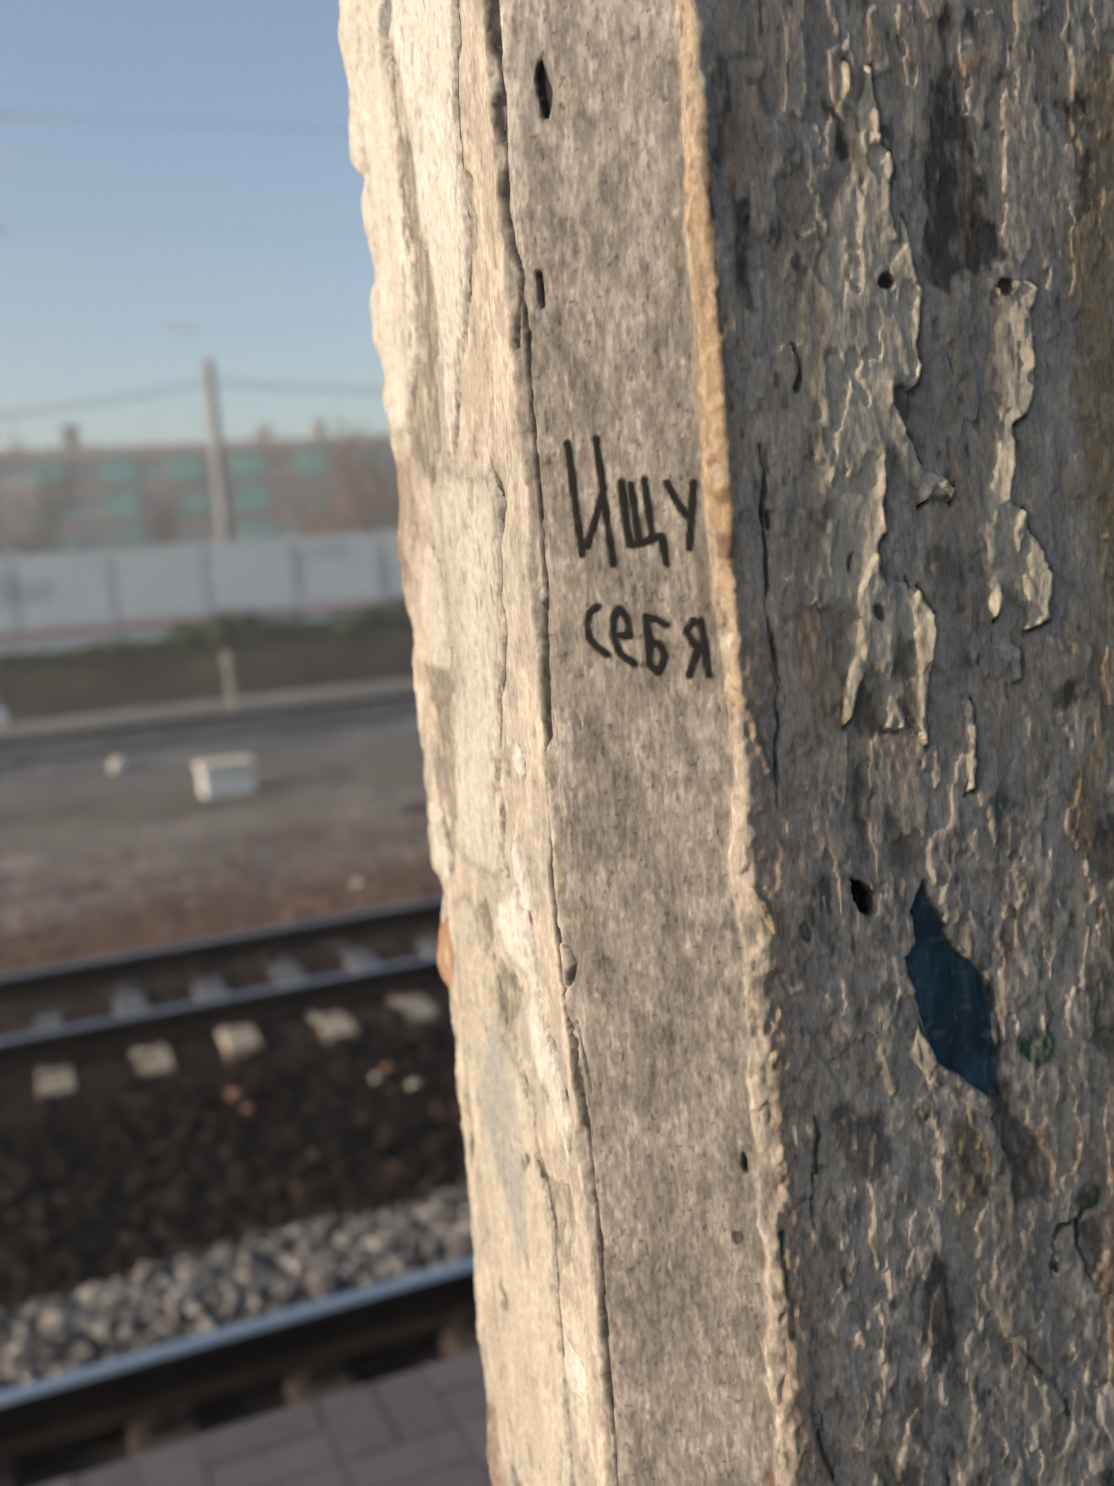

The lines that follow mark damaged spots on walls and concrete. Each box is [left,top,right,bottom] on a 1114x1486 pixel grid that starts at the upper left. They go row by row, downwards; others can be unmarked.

crack [458,0,553,754]
peeling [807,0,1007,746]
peeling [981,279,1053,631]
peeling [960,700,977,792]
peeling [993,645,1022,682]
spalling [975,964,1000,1060]
crack [535,1156,565,1357]
crack [550,845,619,1484]
peeling [909,1025,1053,1205]
crack [1049,1214,1100,1293]